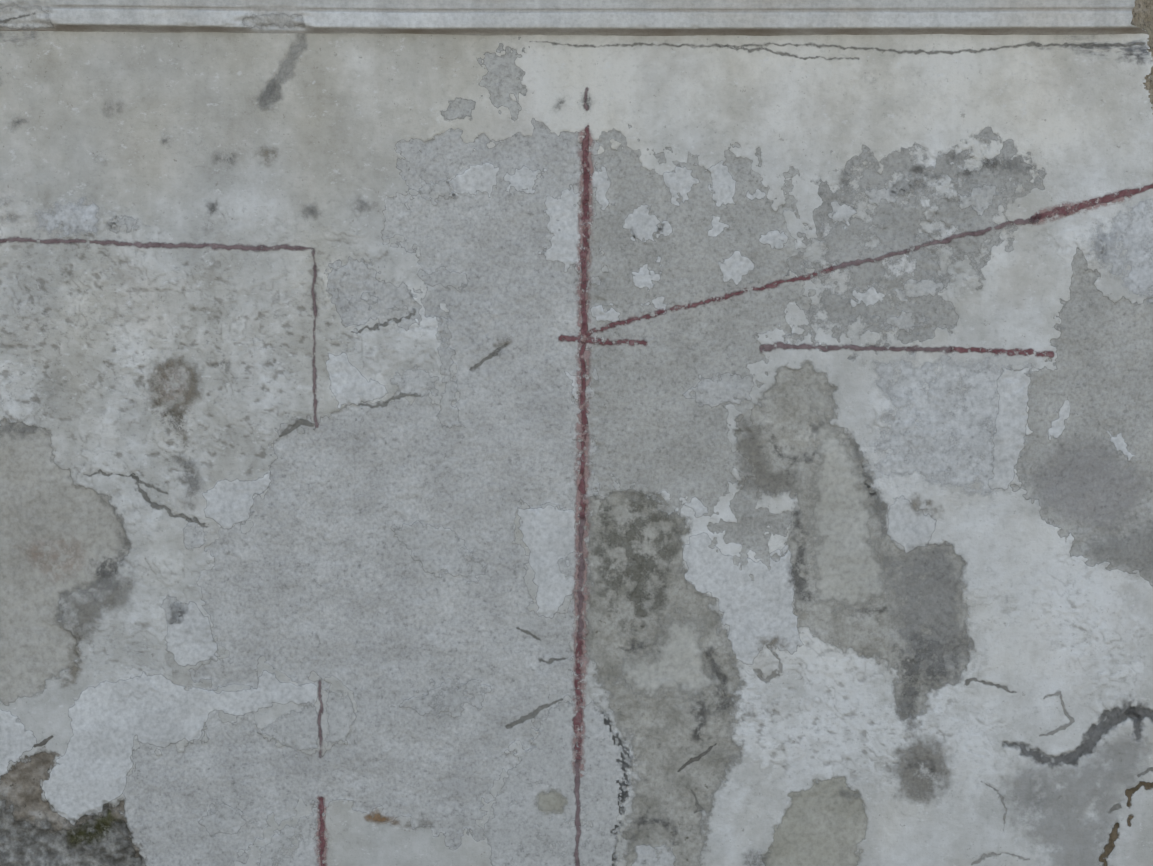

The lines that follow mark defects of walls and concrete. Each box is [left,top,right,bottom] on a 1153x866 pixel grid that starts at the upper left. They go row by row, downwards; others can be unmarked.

flaking render [441,98,475,120]
flaking render [478,37,527,121]
flaking render [0,118,1047,866]
crack [966,678,1016,693]
crack [1003,692,1153,766]
leakage [897,744,949,800]
crack [1099,767,1153,866]
crack [972,852,1029,865]